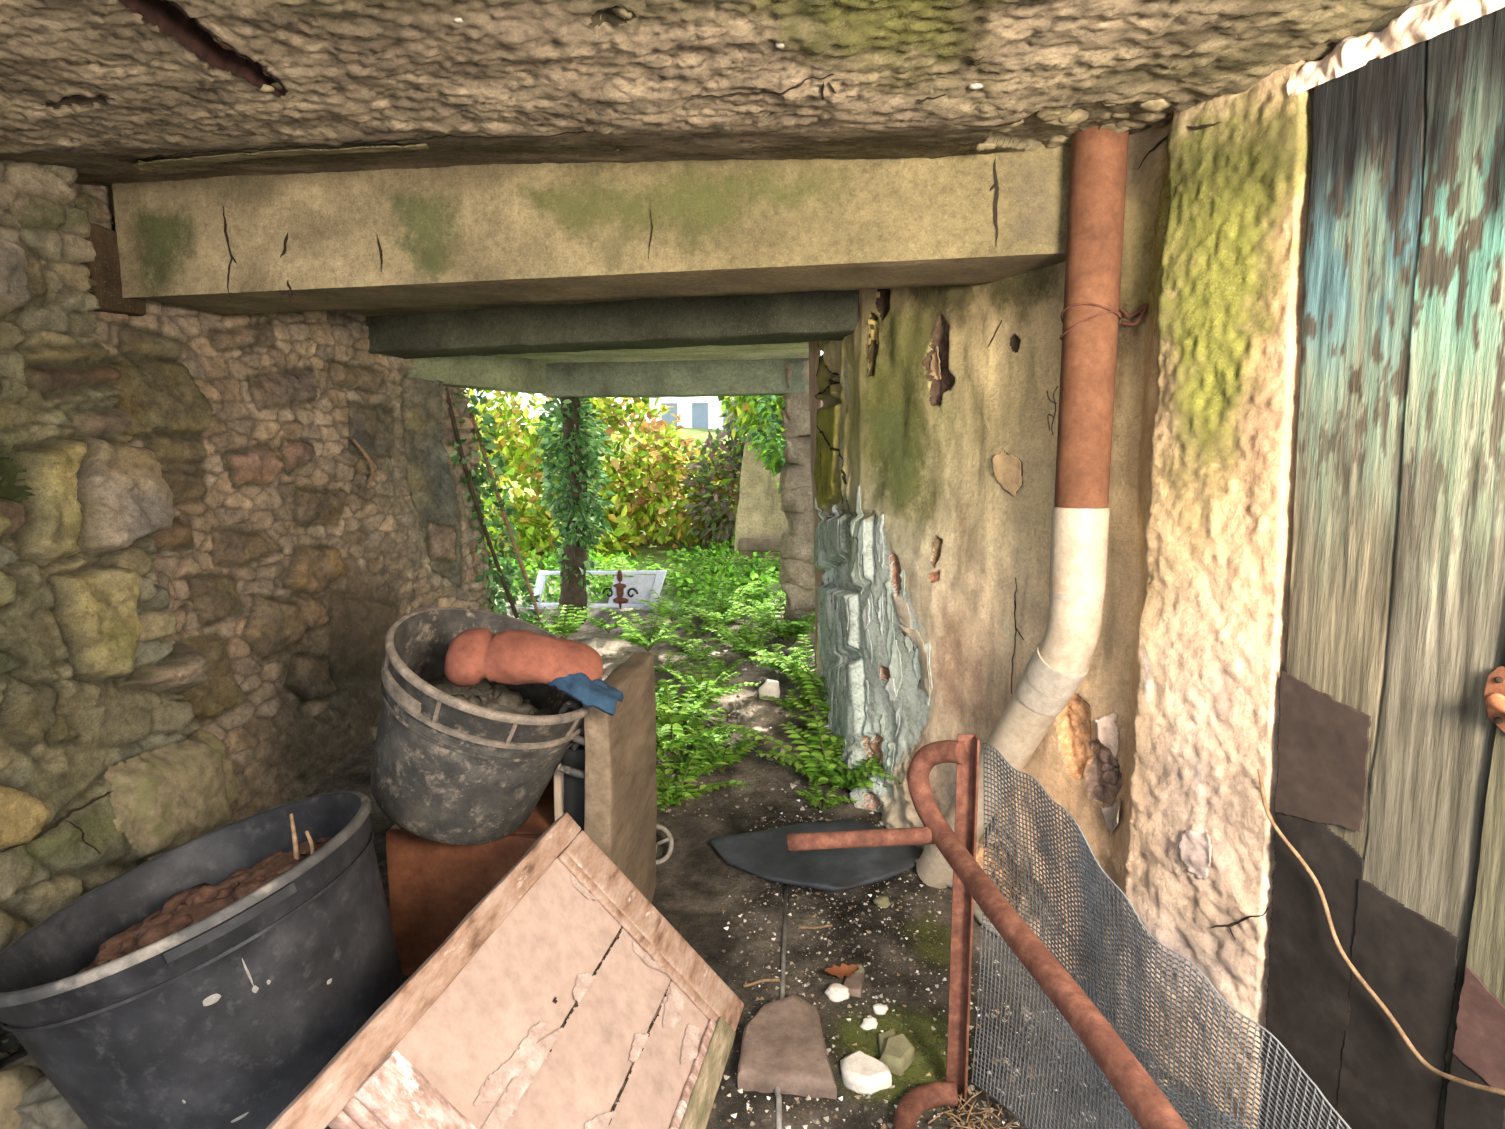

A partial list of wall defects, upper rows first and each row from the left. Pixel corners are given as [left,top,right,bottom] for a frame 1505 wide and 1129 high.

crack [692,74,836,101]
crack [990,158,999,247]
crack [223,206,237,298]
flaking render [922,313,955,407]
water stain [1183,219,1252,427]
peeling [815,486,933,811]
flaking render [1056,693,1123,835]